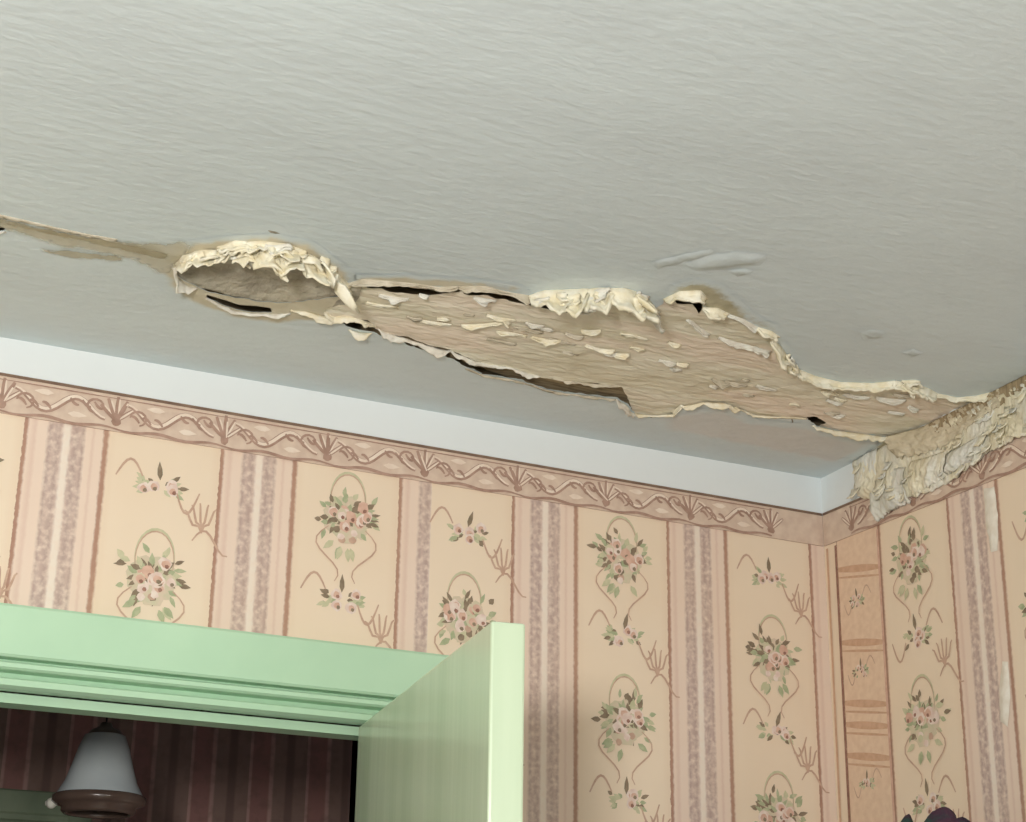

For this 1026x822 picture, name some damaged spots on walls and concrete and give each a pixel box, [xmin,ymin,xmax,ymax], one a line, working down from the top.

flaking render [172,230,1026,522]